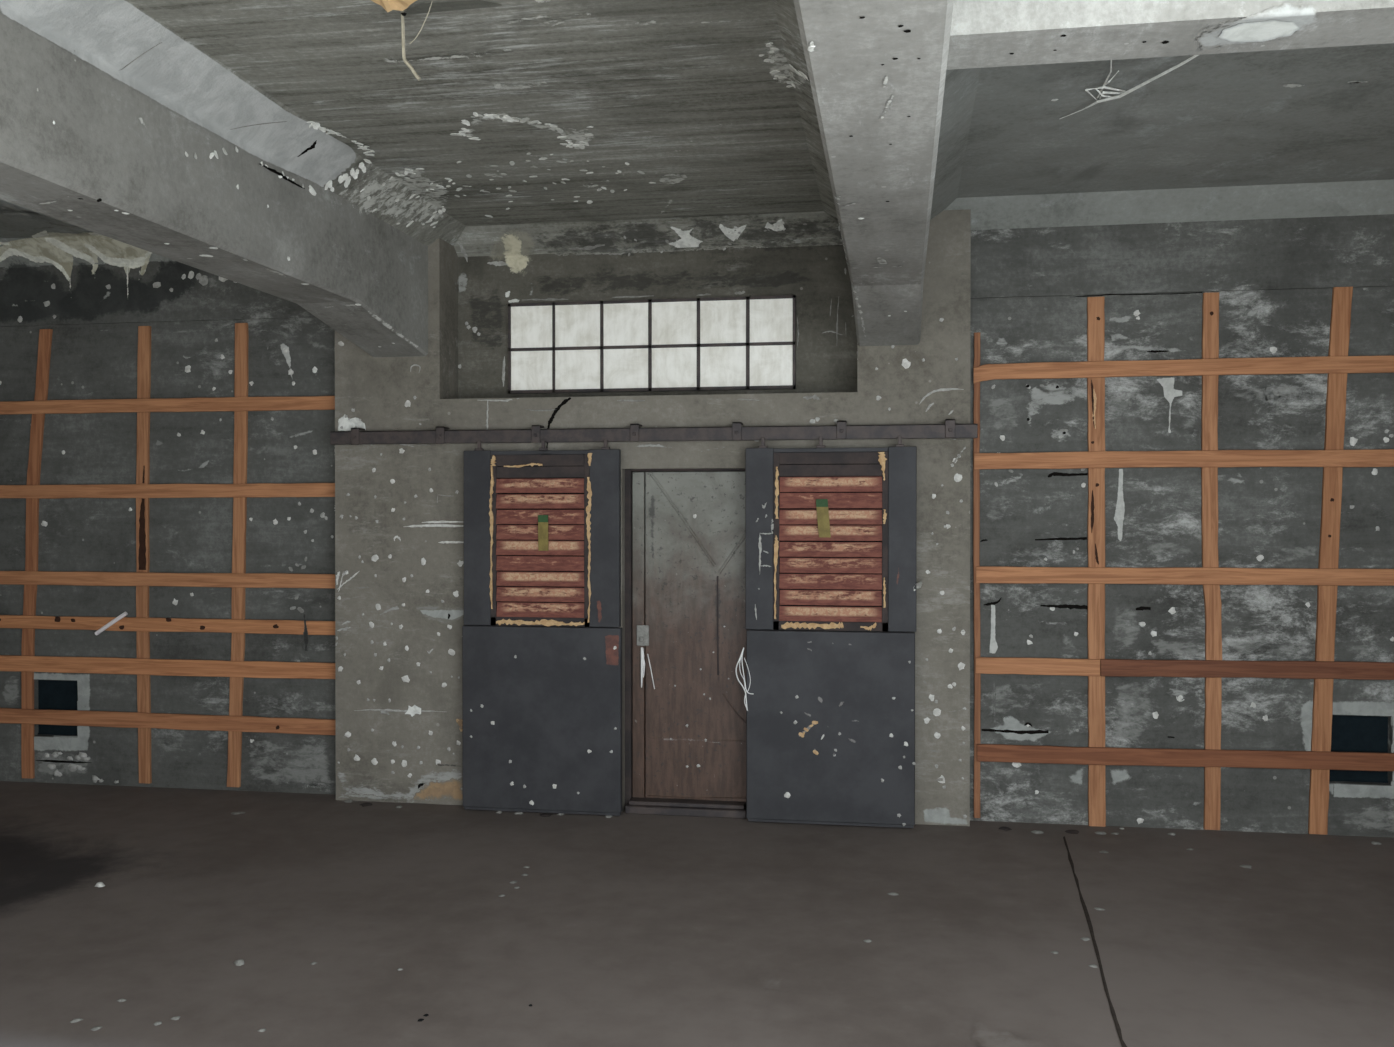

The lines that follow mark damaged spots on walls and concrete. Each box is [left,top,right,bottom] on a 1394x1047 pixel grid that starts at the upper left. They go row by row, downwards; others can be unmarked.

peeling [261,112,658,228]
damp [0,199,206,327]
damp [465,173,844,351]
damp [1156,377,1183,433]
damp [1113,469,1125,542]